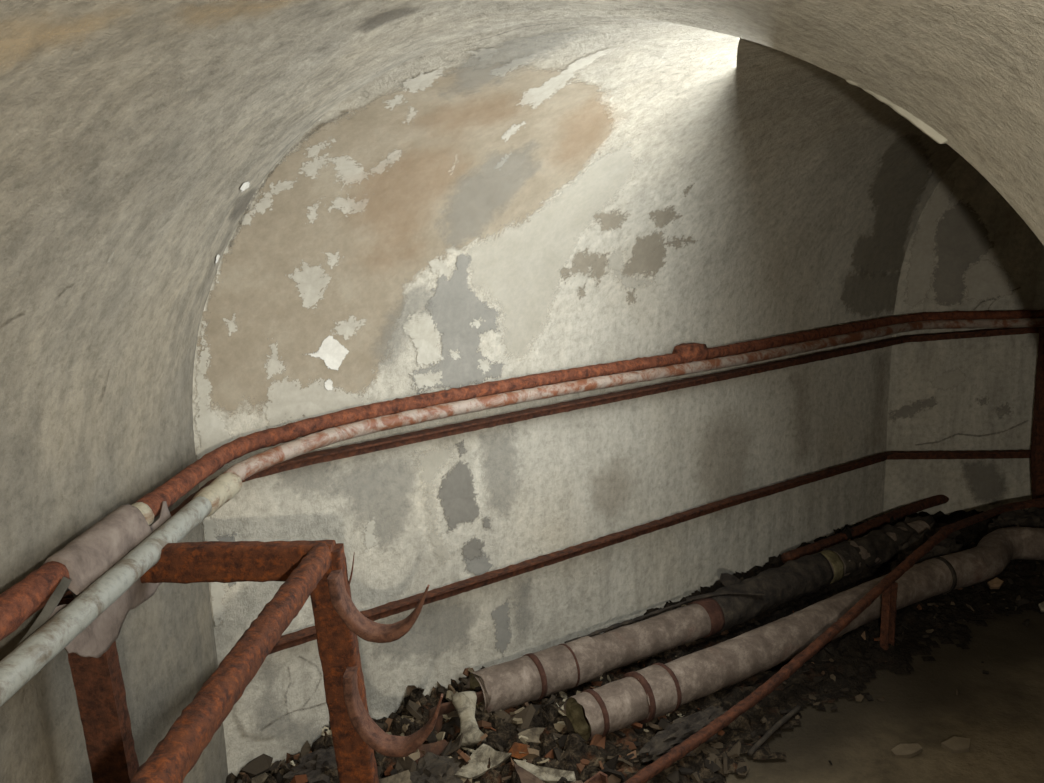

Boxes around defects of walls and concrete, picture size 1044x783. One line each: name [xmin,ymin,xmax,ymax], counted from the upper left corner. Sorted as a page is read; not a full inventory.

peeling [194,43,634,459]
spalling [560,205,695,305]
leakage [841,136,932,316]
peeling [203,515,220,541]
spalling [414,440,491,564]
peeling [210,582,228,630]